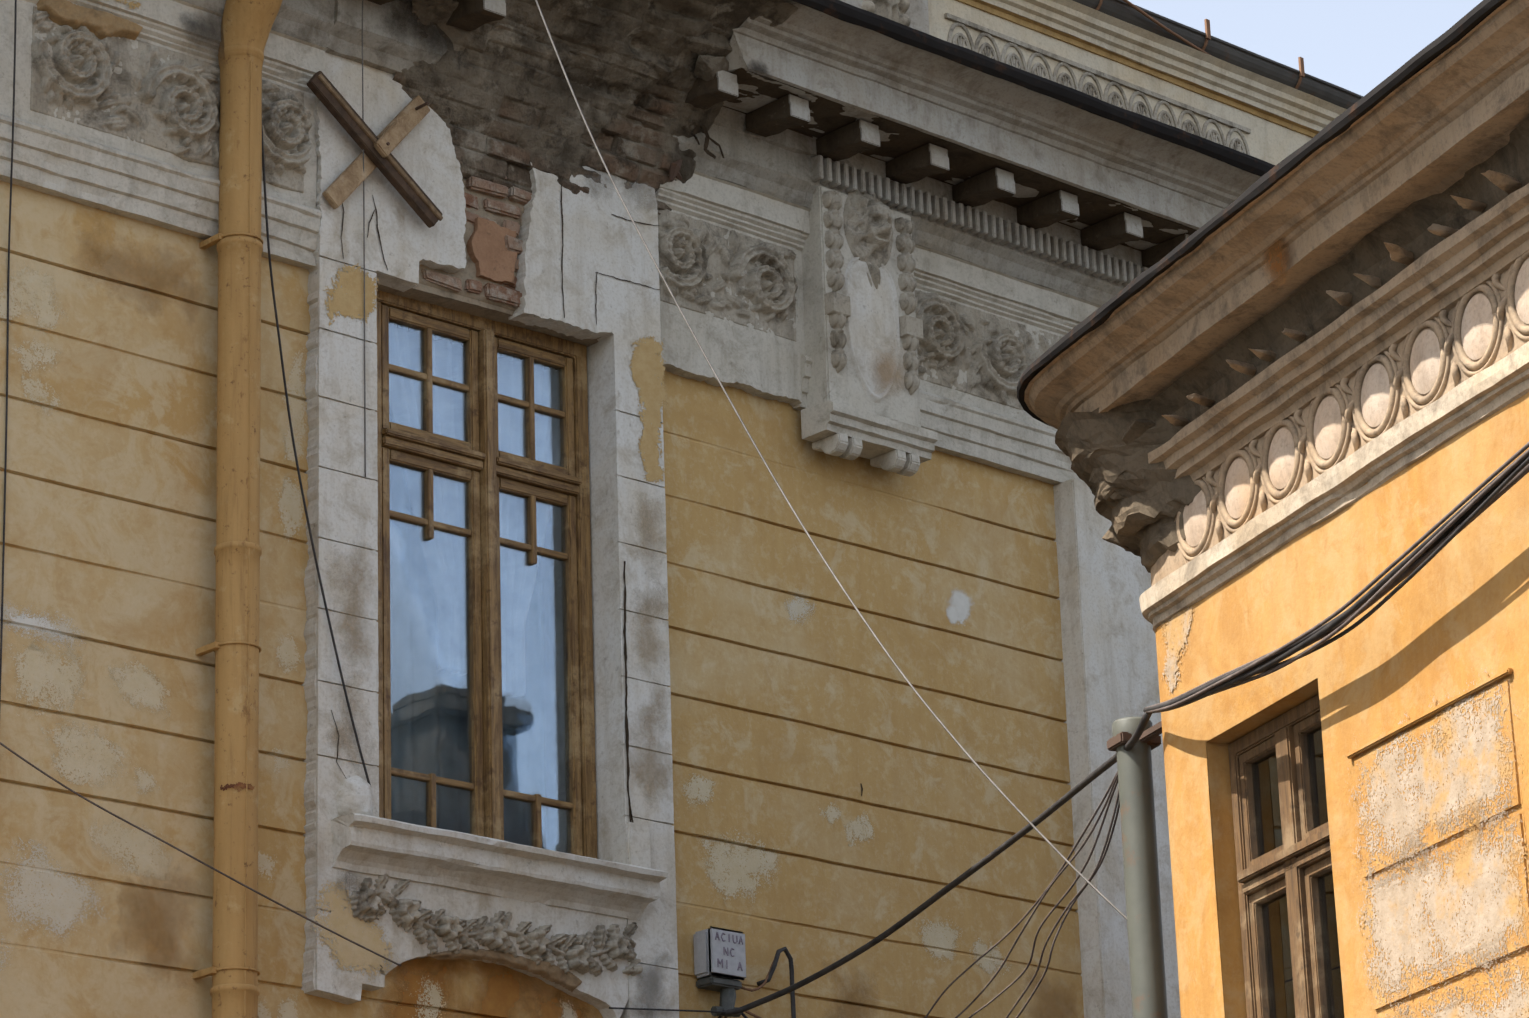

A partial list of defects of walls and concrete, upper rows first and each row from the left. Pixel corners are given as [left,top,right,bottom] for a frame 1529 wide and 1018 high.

spalling [392,0,799,311]
spalling [1451,195,1486,212]
spalling [1481,170,1522,194]
spalling [1384,242,1414,265]
spalling [1427,223,1459,238]
spalling [1326,273,1382,306]
spalling [1226,349,1276,376]
spalling [1055,393,1215,573]
peeling [3,639,171,797]
peeling [87,820,173,880]
peeling [697,827,782,906]
peeling [818,802,875,851]